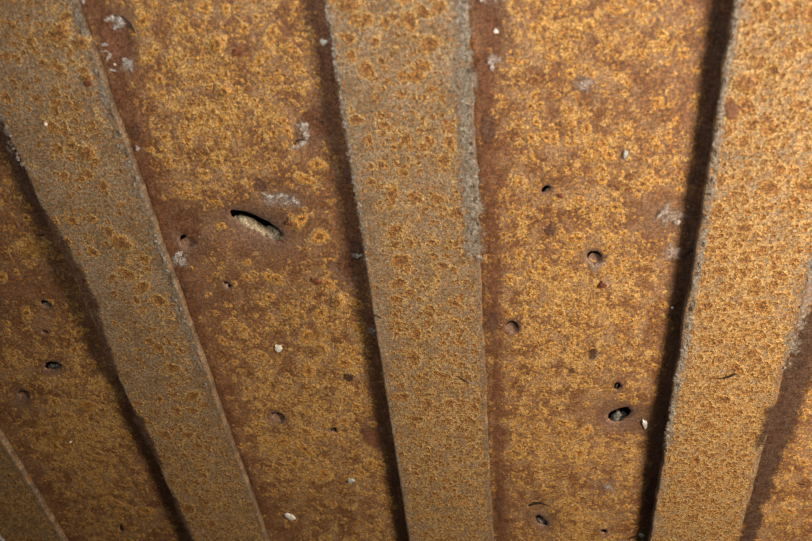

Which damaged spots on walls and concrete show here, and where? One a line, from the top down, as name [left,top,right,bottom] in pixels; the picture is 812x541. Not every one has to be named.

rust [0,119,193,541]
rust [43,0,269,520]
spalling [233,213,283,240]
rust [298,0,408,541]
rust [474,0,507,541]
spalling [608,408,627,421]
rust [636,0,762,541]
rust [740,312,812,541]